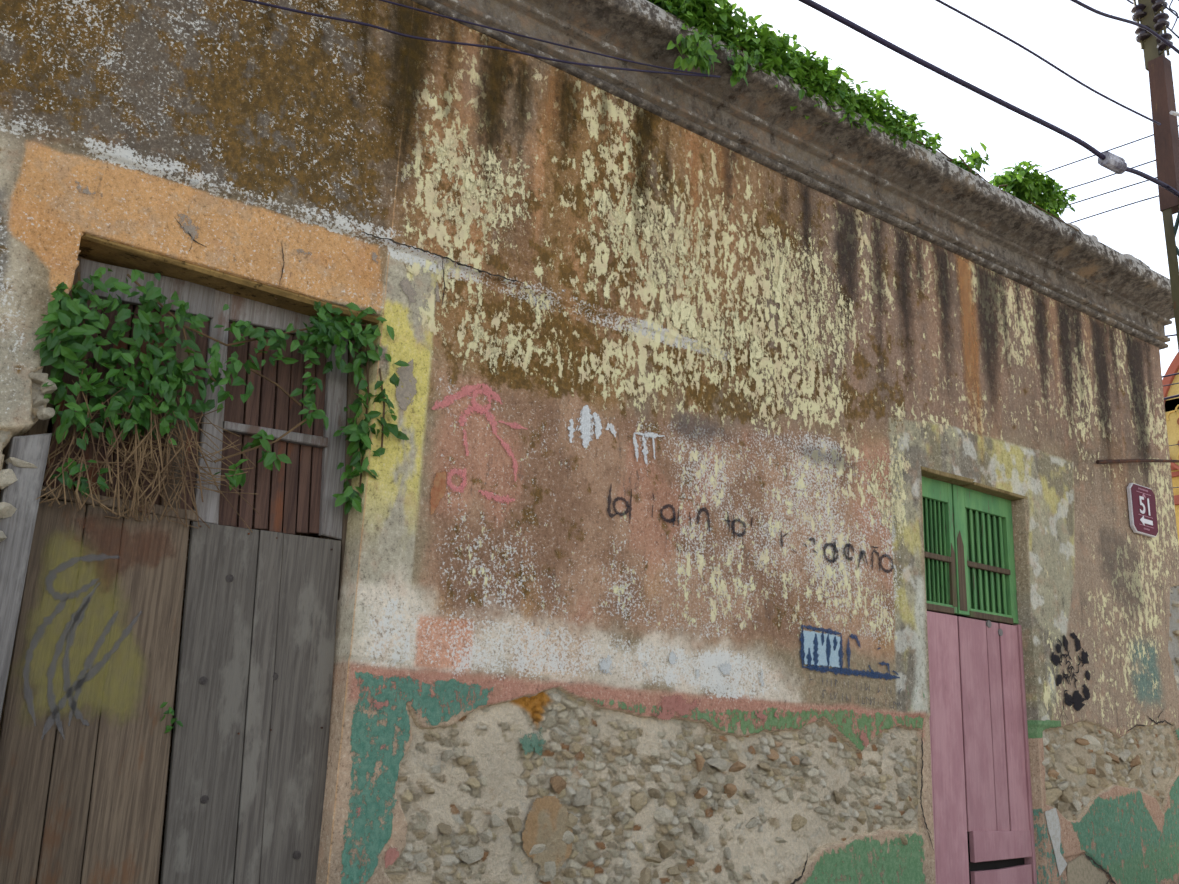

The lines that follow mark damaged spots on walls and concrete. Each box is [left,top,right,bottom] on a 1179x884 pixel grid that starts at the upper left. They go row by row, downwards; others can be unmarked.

peeling [421,128,546,241]
peeling [597,186,764,386]
peeling [760,229,859,393]
damp [837,203,857,305]
damp [873,220,883,308]
damp [897,232,950,353]
damp [976,266,1019,395]
damp [1033,293,1151,474]
flaking render [0,430,38,542]
flaking render [384,688,919,884]
crack [791,853,808,884]
flaking render [1045,808,1111,884]